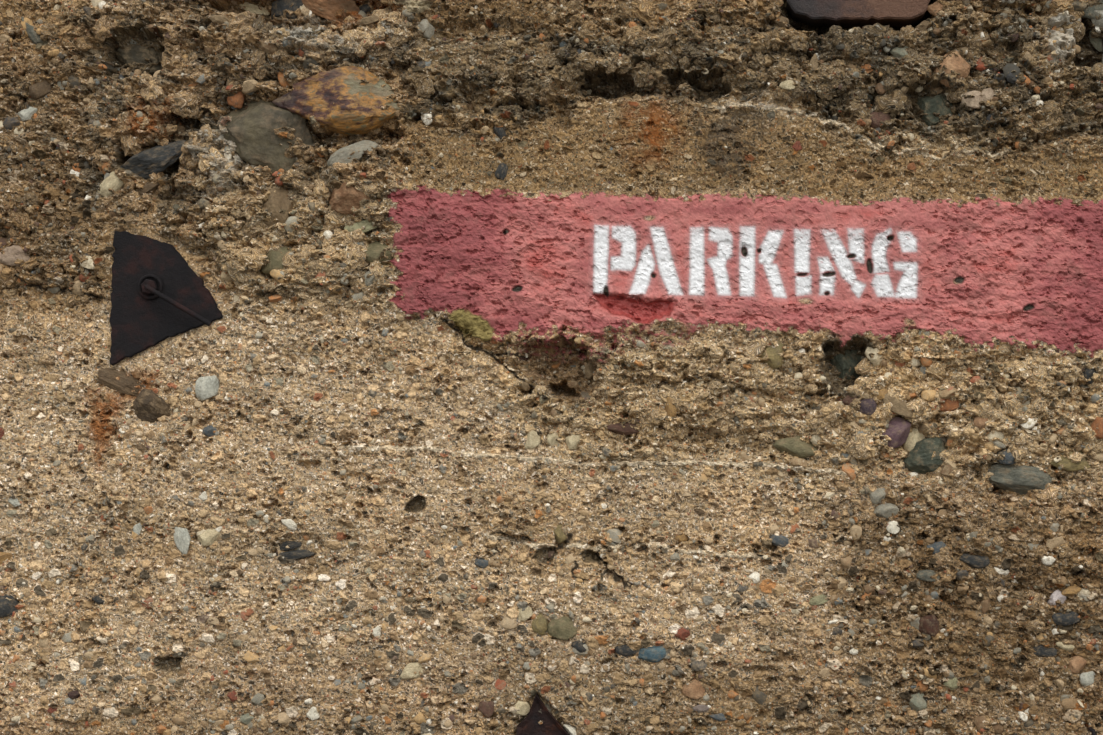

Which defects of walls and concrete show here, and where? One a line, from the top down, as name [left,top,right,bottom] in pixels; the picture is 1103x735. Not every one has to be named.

corrosion [91,375,153,465]